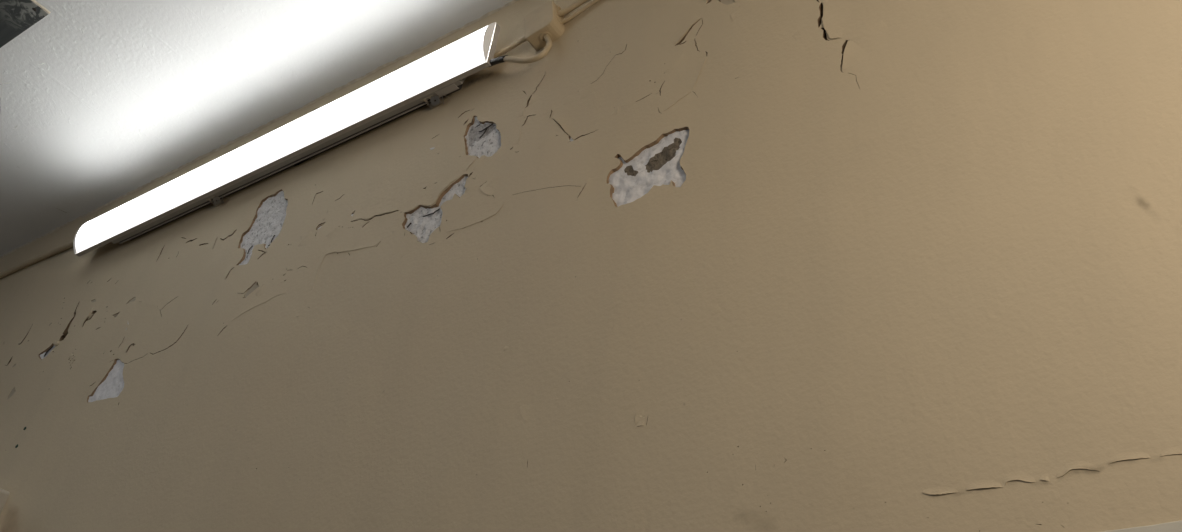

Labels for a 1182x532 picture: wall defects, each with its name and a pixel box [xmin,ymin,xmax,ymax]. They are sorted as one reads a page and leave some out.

crack [672,16,703,46]
crack [792,0,889,89]
flaking render [464,116,501,158]
flaking render [606,127,689,207]
flaking render [220,189,288,265]
crack [312,191,400,228]
flaking render [402,172,473,243]
flaking render [87,327,187,405]